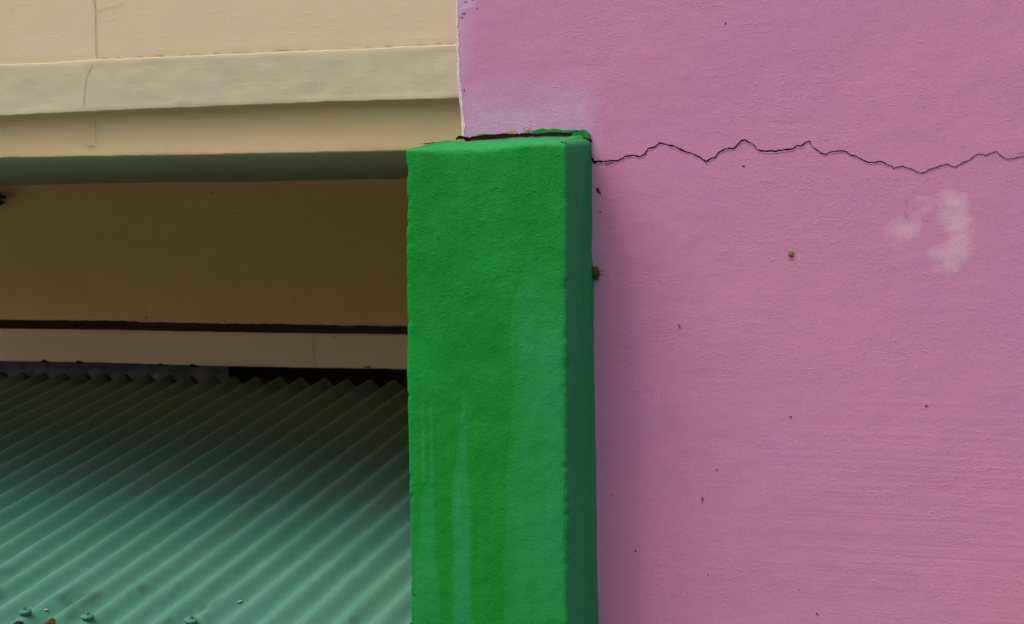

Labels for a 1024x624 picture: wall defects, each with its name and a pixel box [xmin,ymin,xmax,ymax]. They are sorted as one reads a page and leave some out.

crack [425,130,1024,174]
leakage [883,188,977,279]